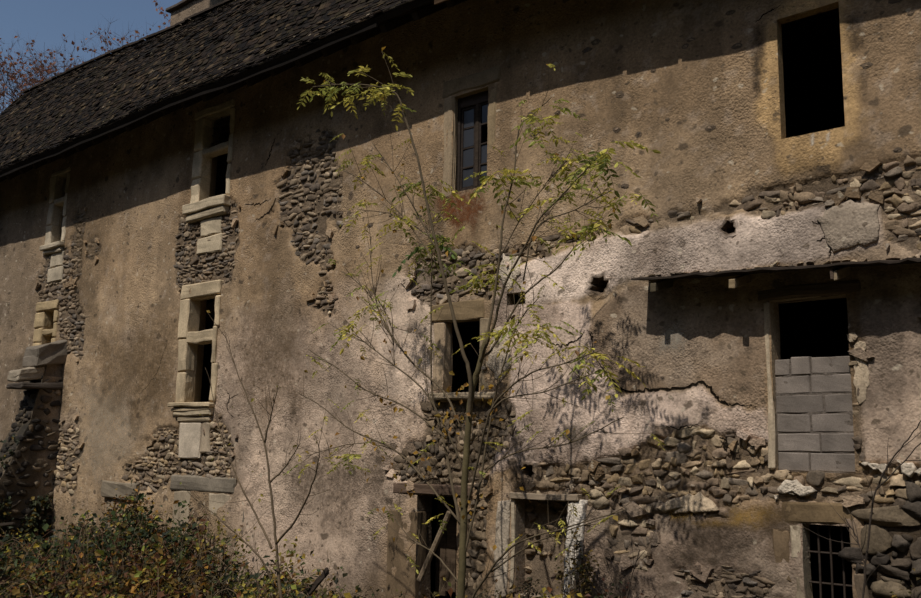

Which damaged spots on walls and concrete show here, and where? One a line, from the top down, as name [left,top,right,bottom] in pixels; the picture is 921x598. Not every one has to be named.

spalling [33,207,102,363]
spalling [272,128,353,316]
peeling [482,311,515,382]
crack [551,330,756,408]
spalling [400,147,921,311]
spalling [54,416,85,496]
spalling [121,413,239,497]
spalling [383,392,516,598]
spalling [515,332,921,598]